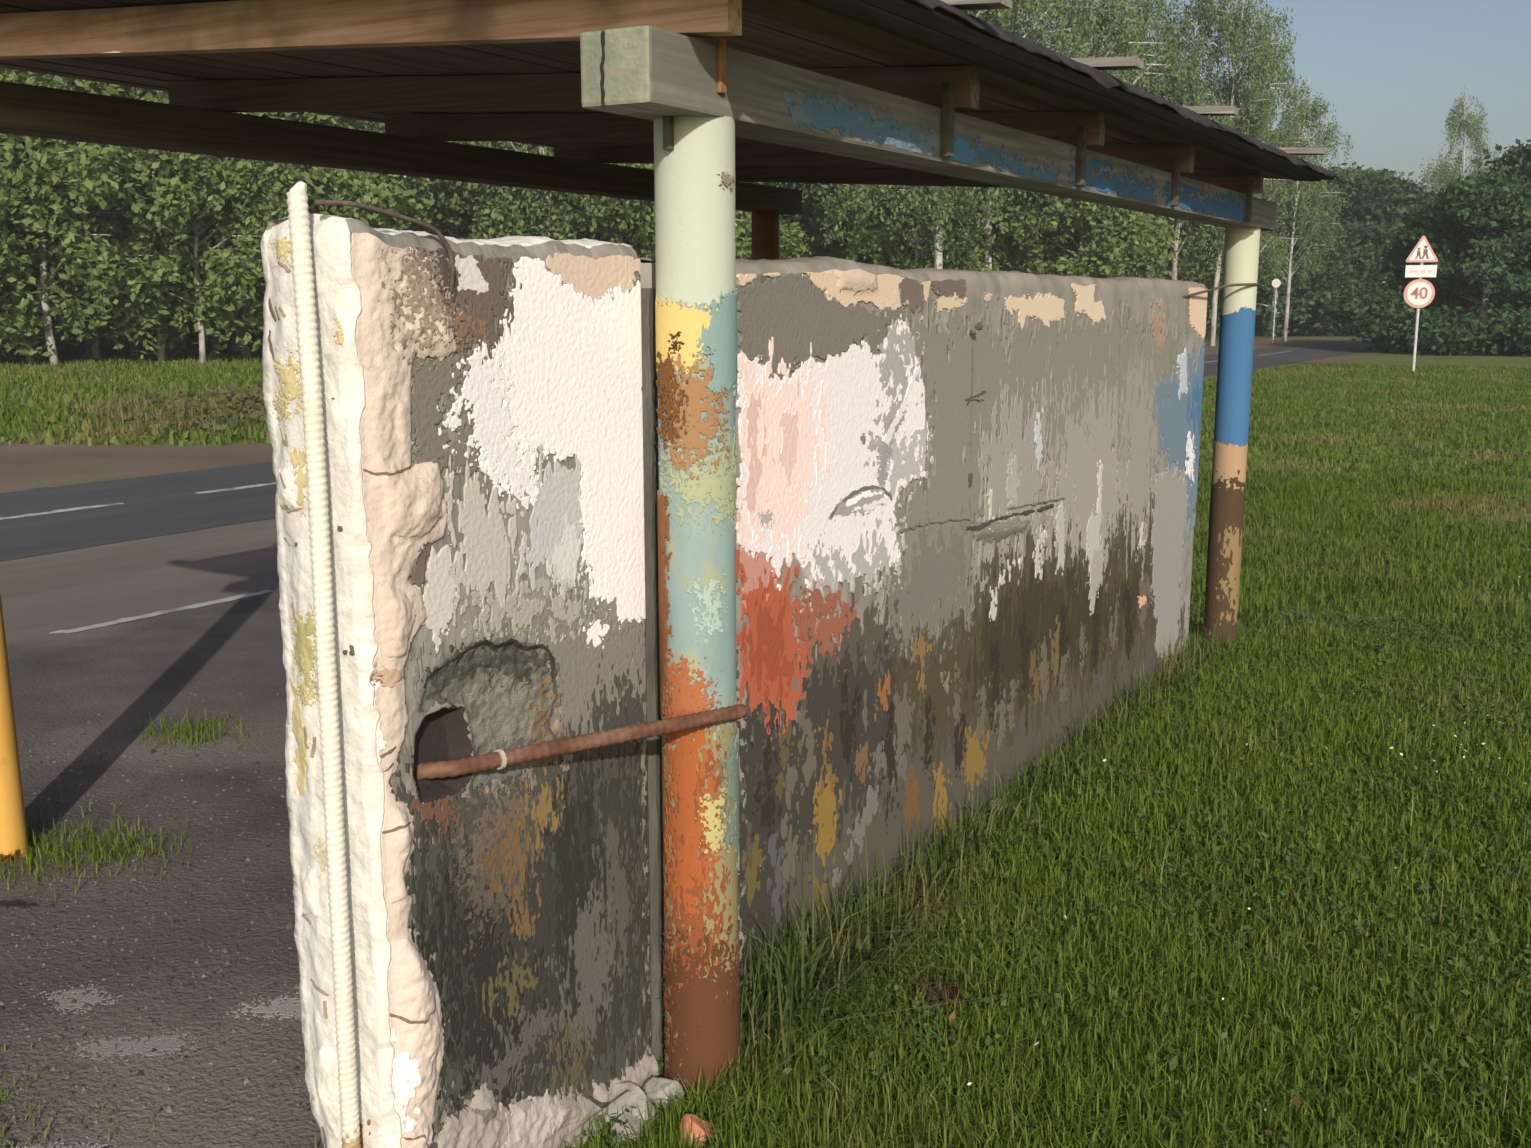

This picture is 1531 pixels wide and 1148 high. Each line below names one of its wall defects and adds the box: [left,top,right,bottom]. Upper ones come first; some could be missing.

peeling [370,673,387,765]
corrosion [407,331,766,1105]
peeling [412,116,934,803]
leakage [371,246,1196,1148]
peeling [780,86,1261,549]
corrosion [1203,440,1248,647]
peeling [390,1028,422,1134]
peeling [472,1089,570,1148]